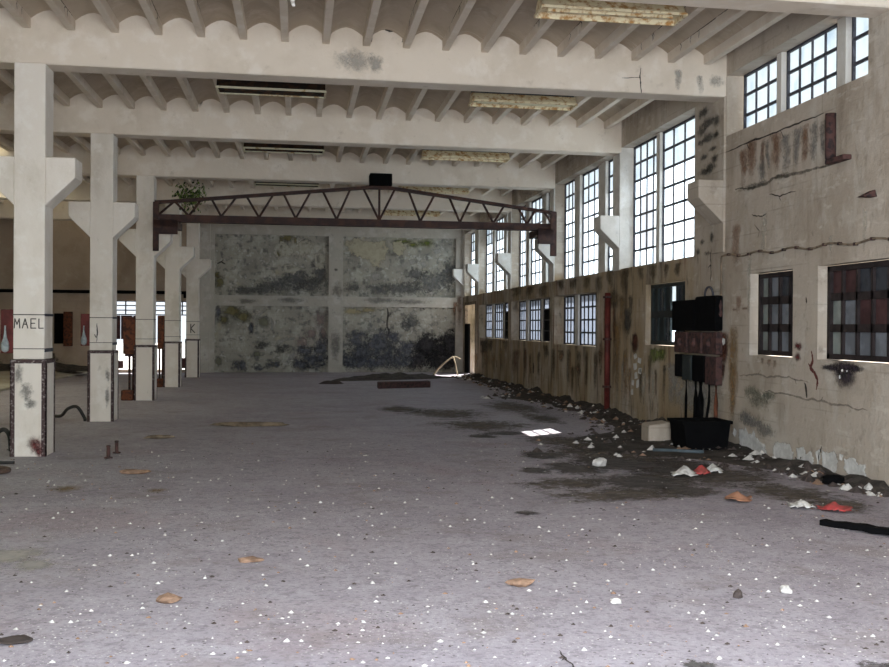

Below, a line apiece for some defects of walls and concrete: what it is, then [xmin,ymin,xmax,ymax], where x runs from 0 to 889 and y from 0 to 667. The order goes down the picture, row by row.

water stain [735,144,830,190]
water stain [215,258,455,371]
water stain [538,346,597,387]
water stain [639,356,708,406]
crack [804,351,818,398]